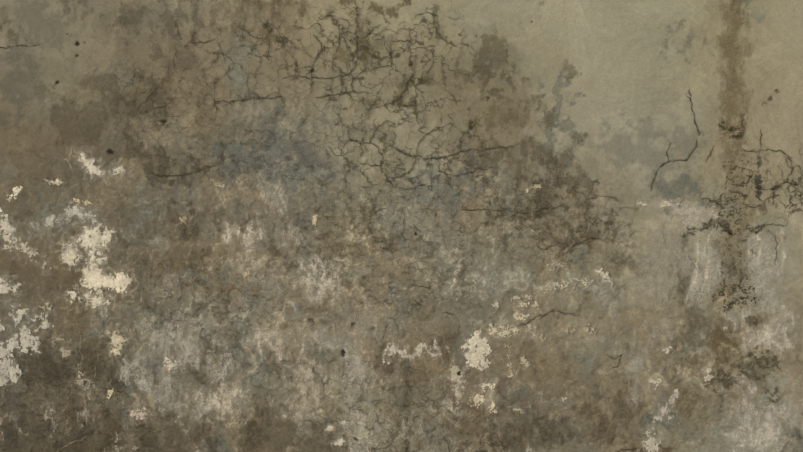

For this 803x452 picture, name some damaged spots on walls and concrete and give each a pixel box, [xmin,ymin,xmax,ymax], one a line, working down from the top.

crack [173,7,521,190]
crack [650,92,713,192]
crack [703,130,801,260]
water stain [638,175,720,353]
water stain [704,226,800,382]
water stain [642,389,679,452]
water stain [733,375,789,452]